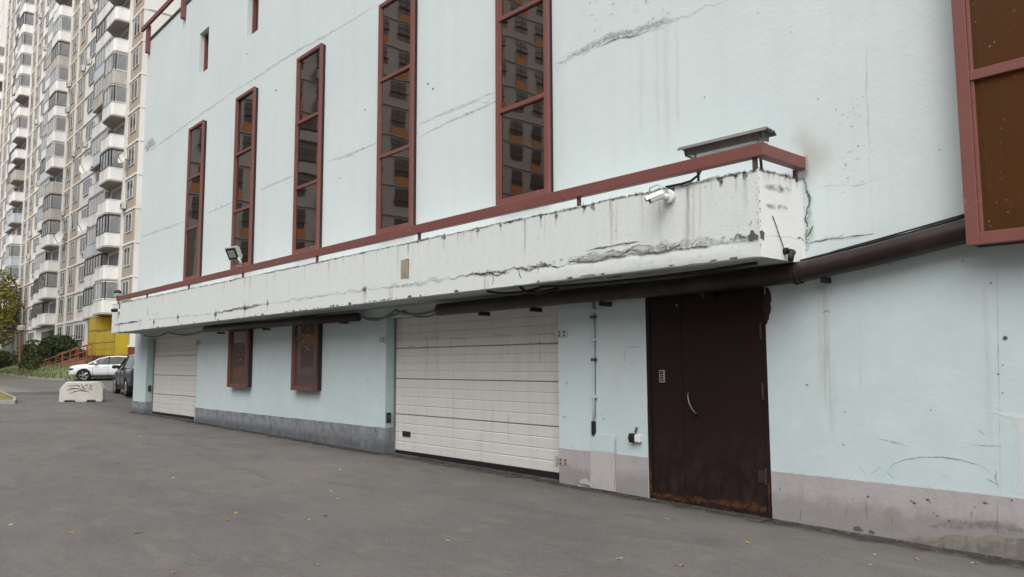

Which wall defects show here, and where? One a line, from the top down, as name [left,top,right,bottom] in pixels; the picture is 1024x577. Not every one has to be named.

crack [563,11,669,57]
damp [353,168,800,255]
spalling [499,181,765,290]
crack [798,177,874,249]
corrosion [649,461,770,516]